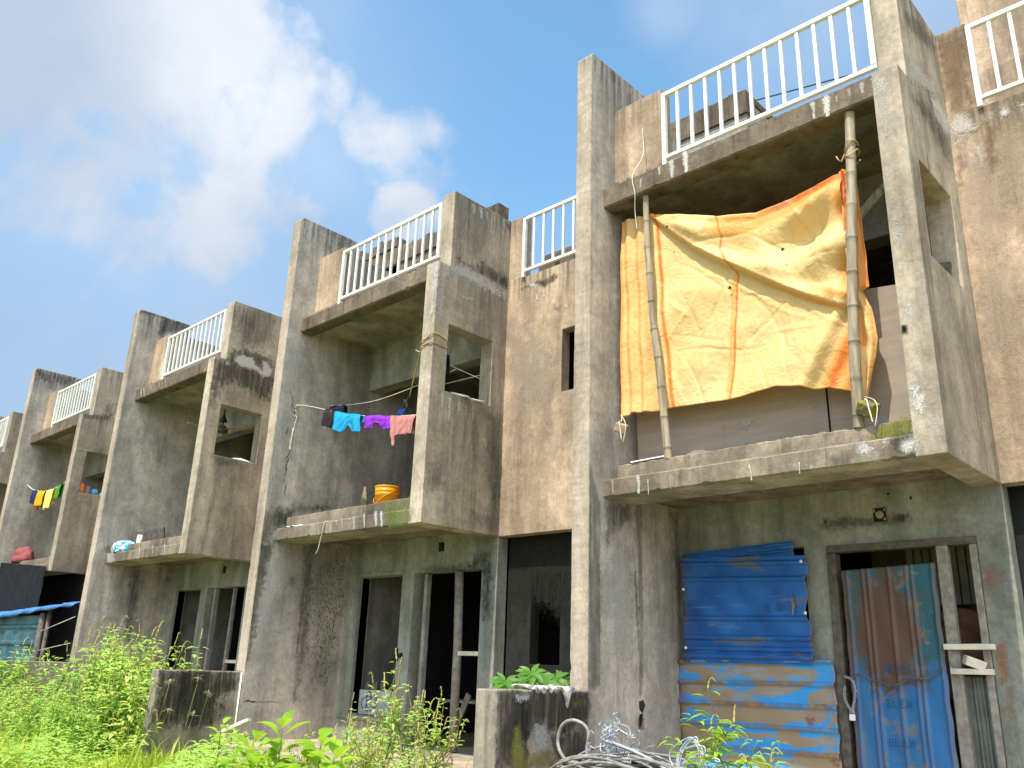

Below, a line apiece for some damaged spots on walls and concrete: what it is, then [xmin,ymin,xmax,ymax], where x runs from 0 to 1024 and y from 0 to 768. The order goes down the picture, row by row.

efflorescence [810,95,830,119]
leakage [210,350,273,398]
crack [283,392,295,493]
leakage [496,691,591,768]